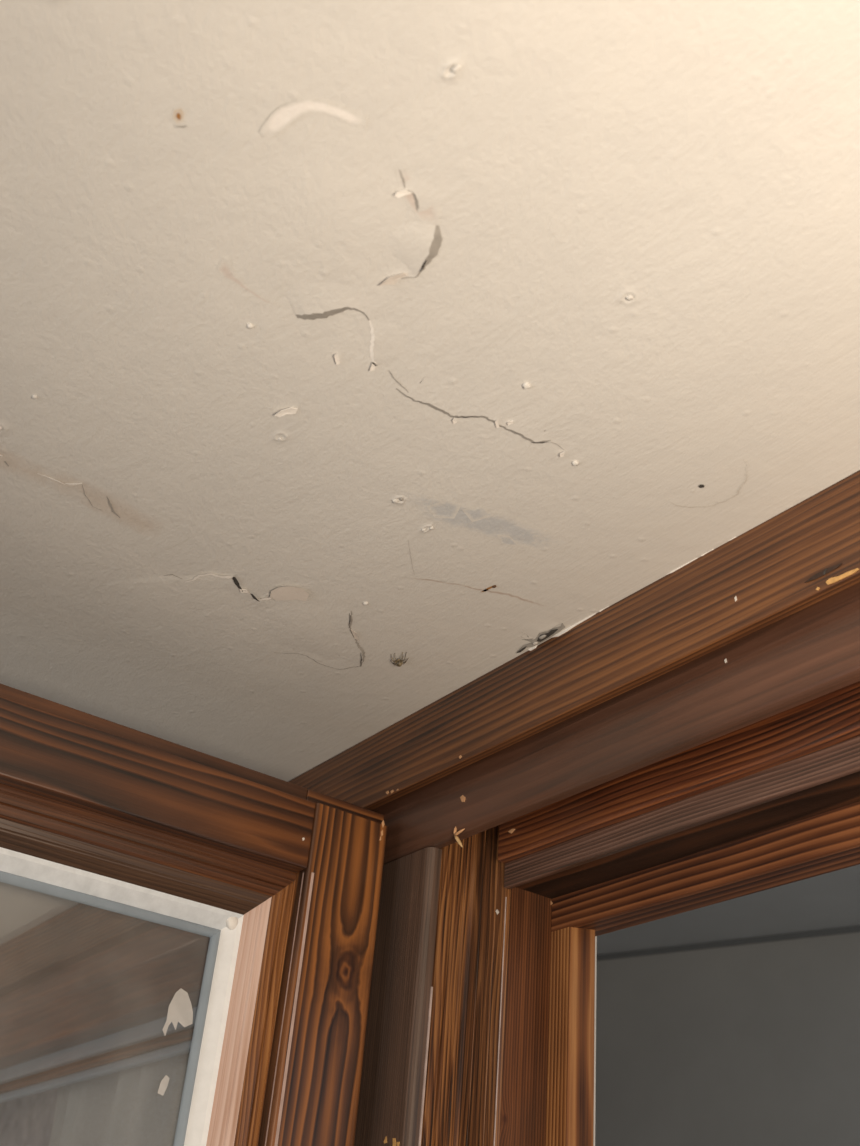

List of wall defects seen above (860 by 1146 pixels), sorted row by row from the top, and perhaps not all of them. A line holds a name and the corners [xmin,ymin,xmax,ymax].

peeling [379,222,443,286]
crack [164,573,276,612]